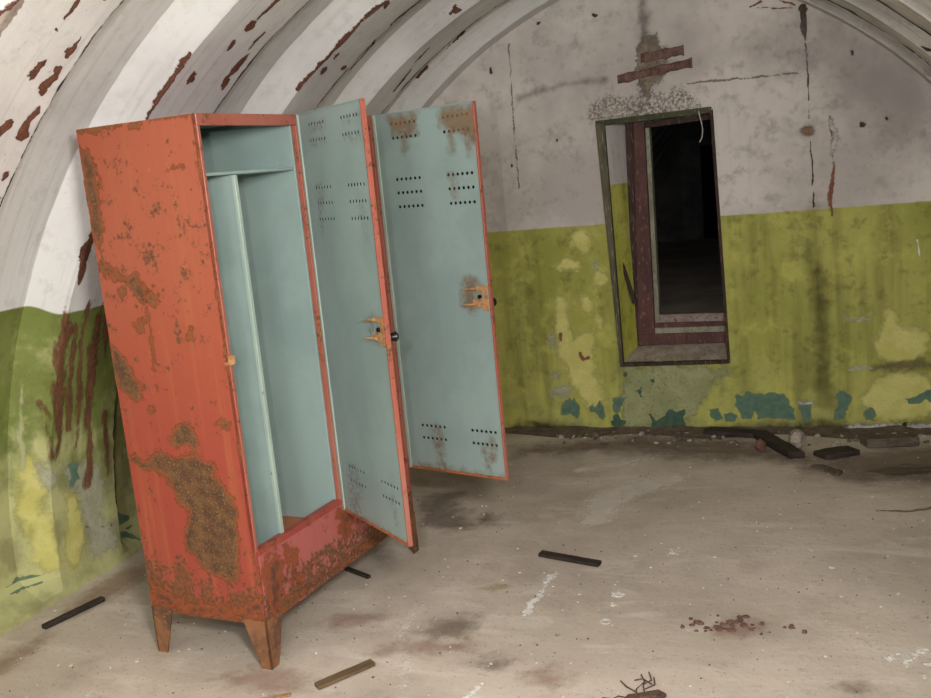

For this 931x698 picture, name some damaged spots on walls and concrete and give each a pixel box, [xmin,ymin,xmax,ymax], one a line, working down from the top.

spalling [0,0,24,37]
spalling [393,47,430,92]
spalling [589,34,700,124]
crack [687,0,931,119]
crack [808,141,816,207]
corrosion [827,115,840,216]
corrosion [37,301,110,490]
peeling [709,391,814,424]